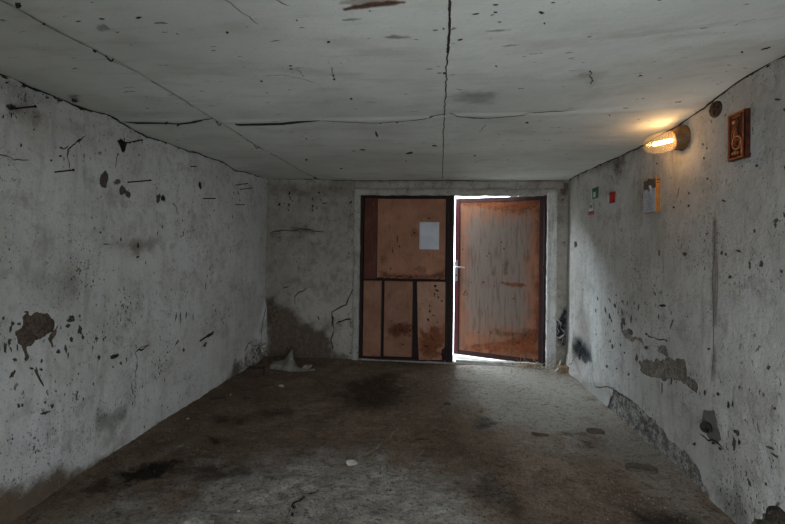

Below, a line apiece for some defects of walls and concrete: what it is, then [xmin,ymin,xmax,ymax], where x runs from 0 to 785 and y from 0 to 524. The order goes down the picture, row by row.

crack [0,0,571,181]
rust [463,200,539,213]
spalling [2,289,139,455]
damp [229,297,347,379]
crack [317,289,353,351]
rust [375,268,444,358]
spalling [595,292,706,396]
spalling [592,376,709,496]
spalling [756,506,785,524]